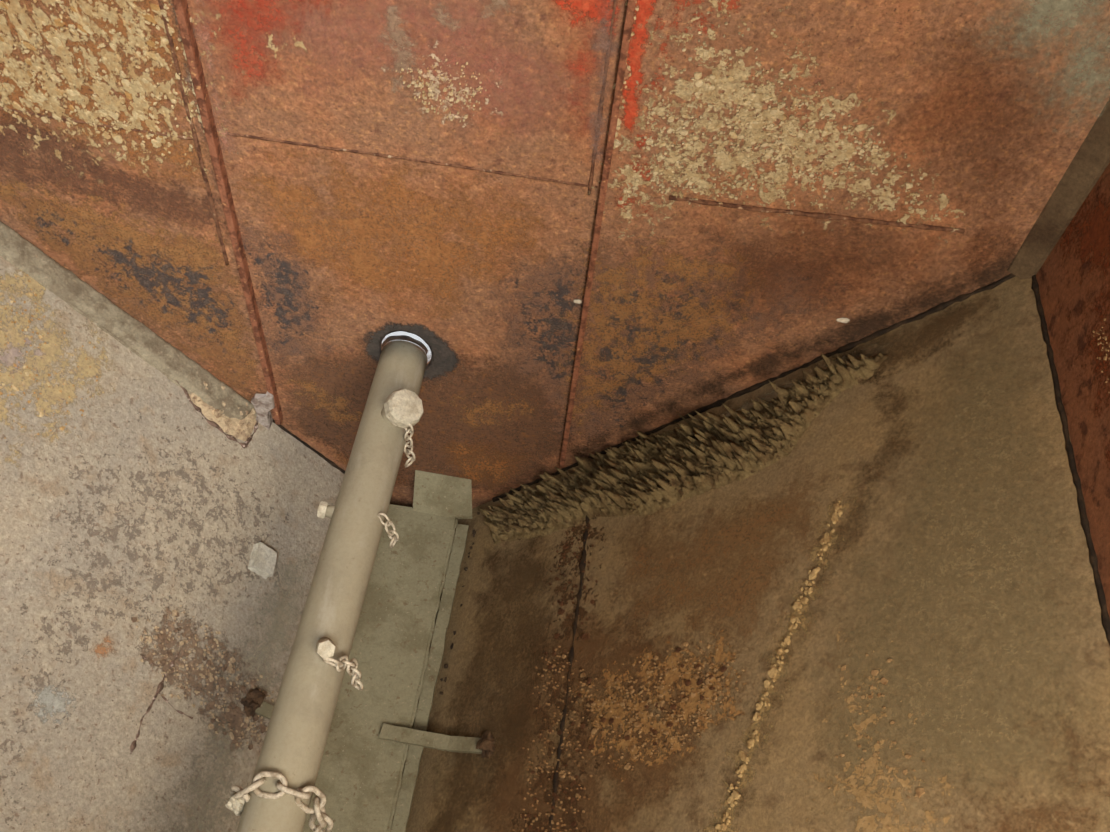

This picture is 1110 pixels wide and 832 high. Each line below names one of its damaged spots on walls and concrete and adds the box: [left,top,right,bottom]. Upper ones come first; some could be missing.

rust [0,0,202,186]
peeling [0,0,235,183]
peeling [263,32,307,66]
peeling [555,0,966,239]
rust [0,179,391,464]
rust [395,346,562,490]
water stain [492,231,1013,451]
rust [127,605,274,751]
rust [511,514,746,832]
water stain [703,497,865,832]